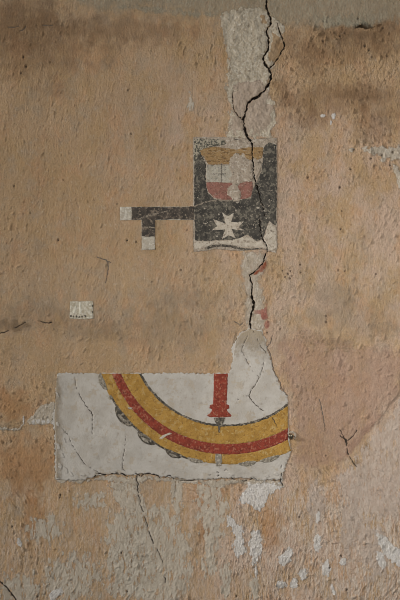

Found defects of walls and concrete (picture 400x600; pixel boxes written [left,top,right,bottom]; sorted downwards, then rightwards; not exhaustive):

flaking render [220,6,285,139]
crack [232,0,288,428]
crack [66,433,194,562]
flaking render [0,250,297,600]
crack [340,430,357,467]
peeling [335,399,400,585]
peeling [274,568,308,589]